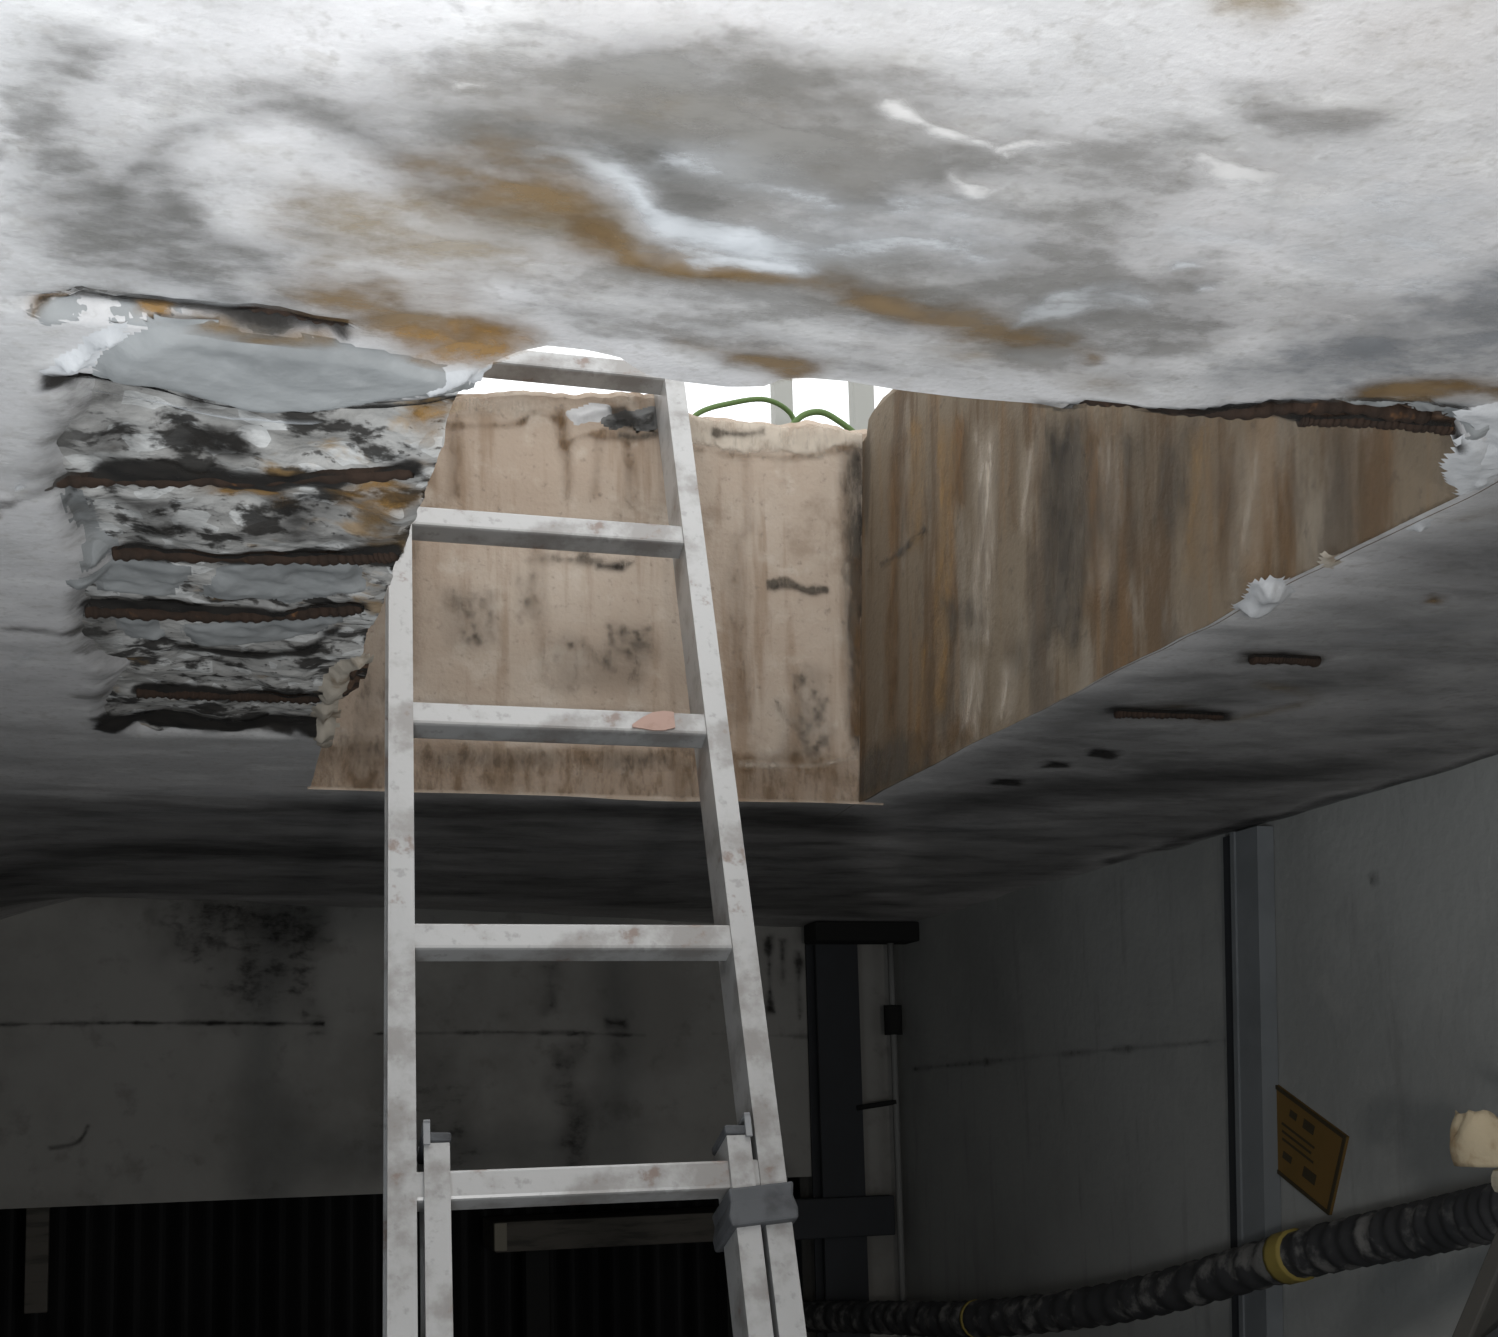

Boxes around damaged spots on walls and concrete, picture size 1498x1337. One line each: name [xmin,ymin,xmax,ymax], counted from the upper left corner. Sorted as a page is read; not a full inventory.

damp [62,187,266,306]
damp [428,49,1222,370]
spalling [26,286,349,345]
damp [1288,337,1413,393]
rust [1359,380,1498,401]
spalling [1040,397,1498,496]
spalling [42,373,460,748]
damp [734,448,928,825]
rust [1088,749,1117,759]